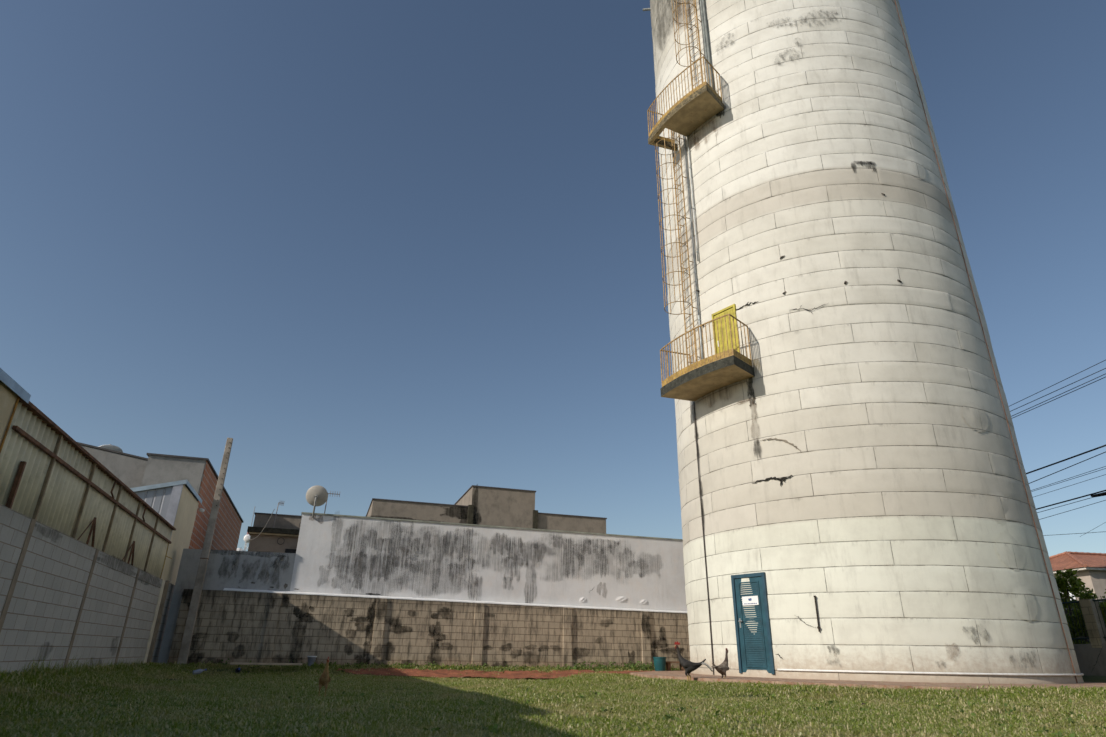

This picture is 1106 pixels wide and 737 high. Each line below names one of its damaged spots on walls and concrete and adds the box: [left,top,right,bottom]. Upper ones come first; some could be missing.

crack [753,475,793,486]
water stain [350,487,482,599]
water stain [490,534,619,603]
water stain [261,555,313,663]
water stain [344,602,415,665]
water stain [428,607,452,664]
water stain [641,615,684,657]